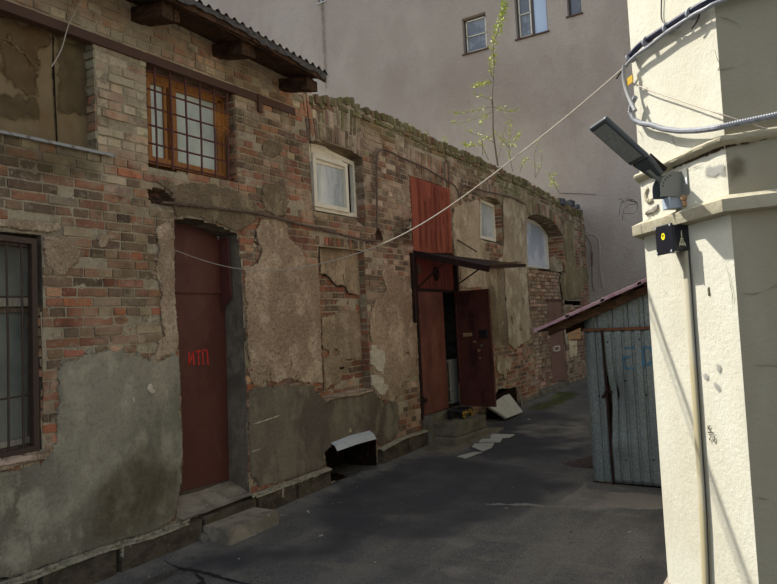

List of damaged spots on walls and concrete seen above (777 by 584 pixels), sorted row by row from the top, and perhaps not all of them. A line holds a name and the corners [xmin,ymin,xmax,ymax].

flaking render [147,179,417,402]
crack [162,559,250,584]